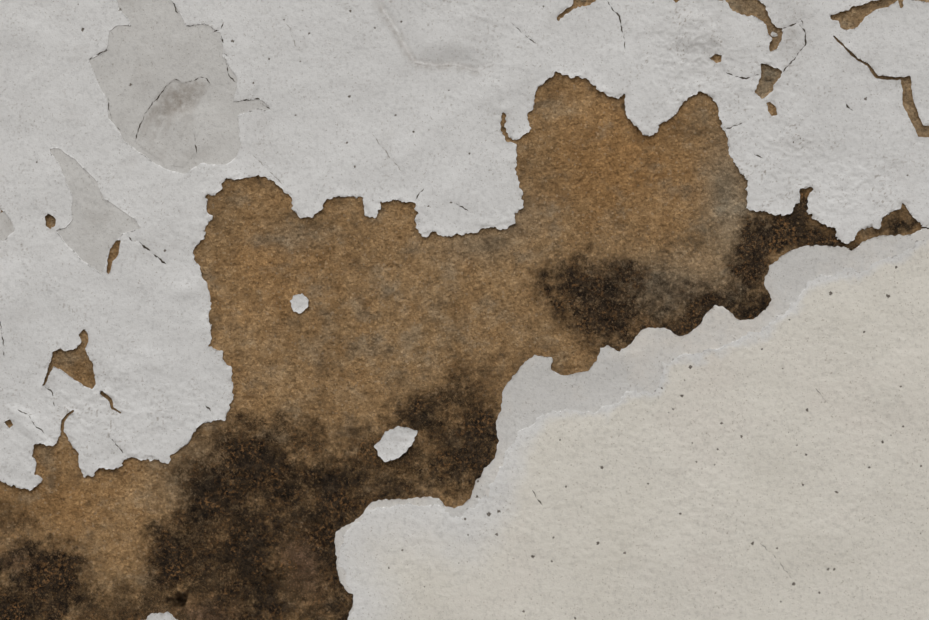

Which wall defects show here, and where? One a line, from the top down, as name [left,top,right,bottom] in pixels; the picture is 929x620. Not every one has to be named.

spalling [755,64,782,99]
spalling [830,0,929,126]
peeling [0,208,14,241]
peeling [45,148,141,274]
water stain [535,191,860,352]
water stain [877,214,929,236]
spalling [43,329,96,389]
peeling [237,168,929,620]
water stain [0,360,499,620]
peeling [146,608,179,620]